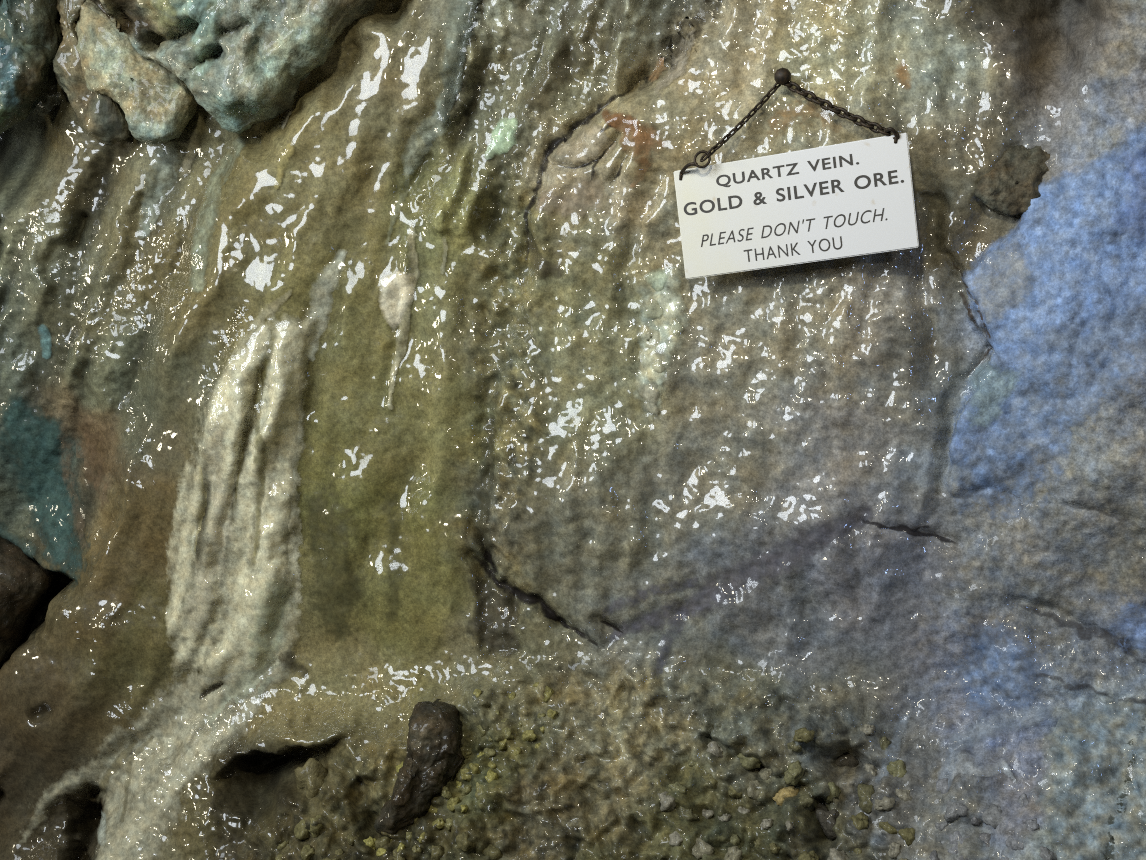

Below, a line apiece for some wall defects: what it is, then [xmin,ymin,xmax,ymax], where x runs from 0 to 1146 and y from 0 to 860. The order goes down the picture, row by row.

crack [523,79,647,258]
crack [862,520,954,542]
crack [477,535,622,645]